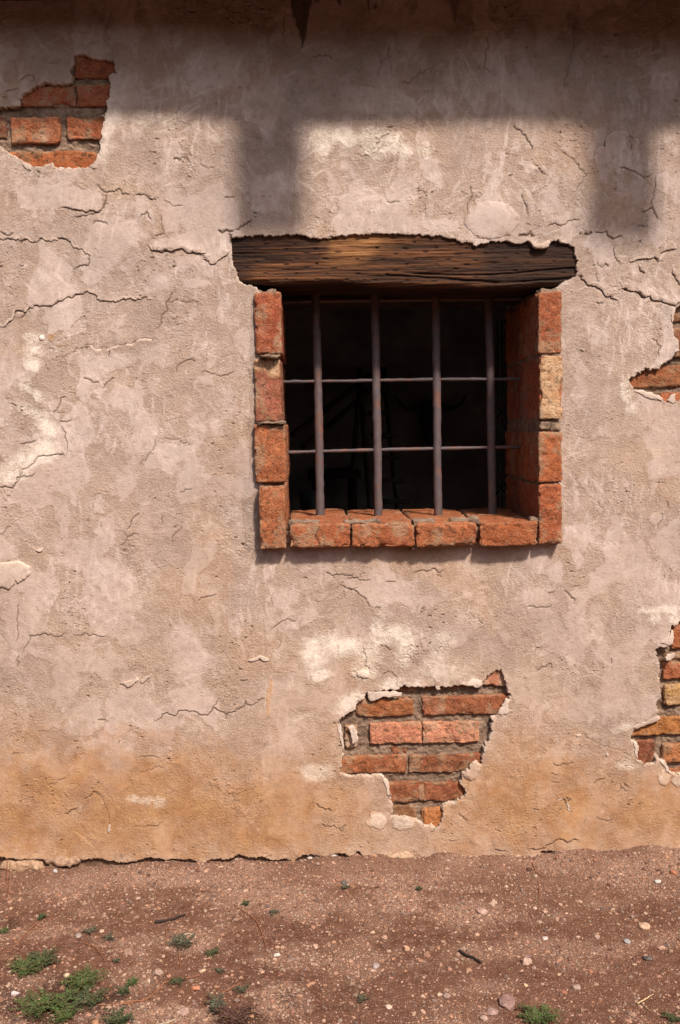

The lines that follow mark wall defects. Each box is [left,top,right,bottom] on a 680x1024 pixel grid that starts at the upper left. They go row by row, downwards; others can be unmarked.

spalling [0,55,115,172]
crack [561,130,658,219]
crack [0,185,251,388]
crack [519,195,680,306]
spalling [629,306,680,404]
crack [0,396,72,488]
flaking render [0,561,30,590]
water stain [0,695,394,863]
crack [152,680,264,723]
spalling [337,670,512,827]
spalling [631,621,680,773]